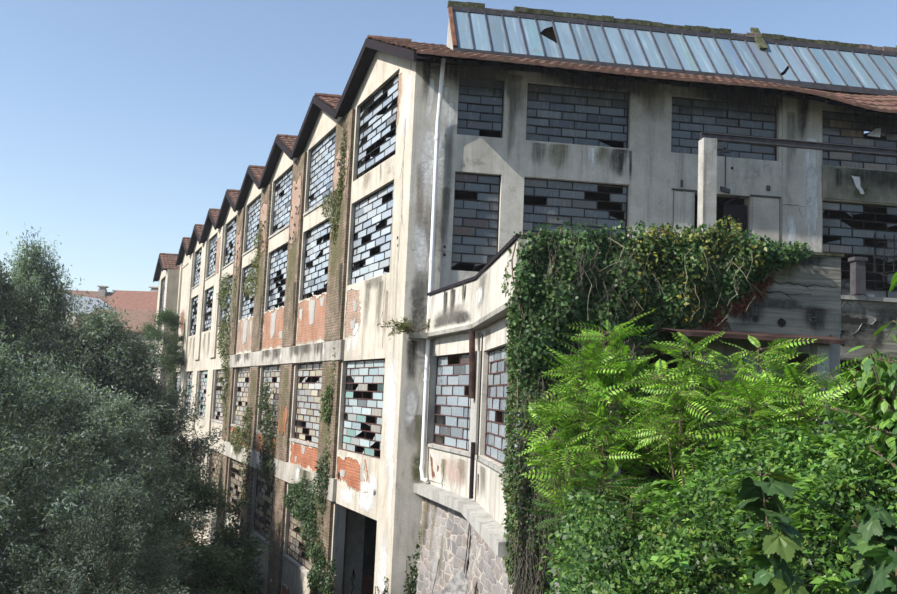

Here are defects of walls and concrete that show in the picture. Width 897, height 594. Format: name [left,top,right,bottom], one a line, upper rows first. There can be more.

leakage [414,59,454,270]
leakage [588,148,632,174]
spalling [236,306,284,354]
spalling [296,292,327,346]
leakage [411,280,428,330]
leakage [435,283,468,327]
crack [766,281,837,299]
leakage [407,340,417,375]
spalling [256,405,318,472]
leakage [385,365,396,513]
spalling [336,455,376,496]
leakage [341,476,377,511]